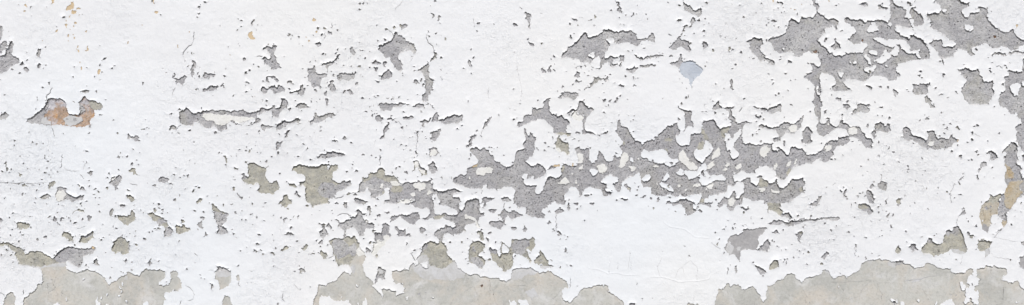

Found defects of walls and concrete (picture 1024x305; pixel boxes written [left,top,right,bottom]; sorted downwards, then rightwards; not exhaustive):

flaking render [0,119,188,305]
peeling [165,24,417,205]
peeling [240,0,1024,305]